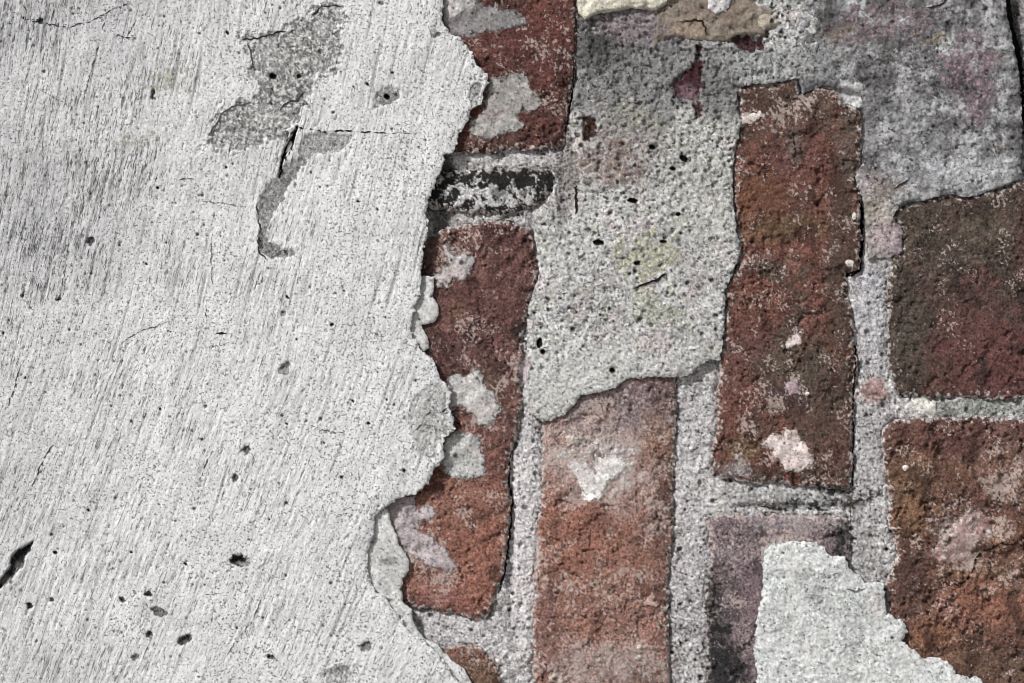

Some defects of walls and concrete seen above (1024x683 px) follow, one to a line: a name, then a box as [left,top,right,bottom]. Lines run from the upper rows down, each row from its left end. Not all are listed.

spalling [731,34,764,53]
crack [279,126,410,178]
spalling [374,87,399,107]
spalling [583,117,597,142]
spalling [672,44,705,119]
flaking render [410,276,439,352]
peeling [409,386,451,464]
flaking render [367,507,472,683]